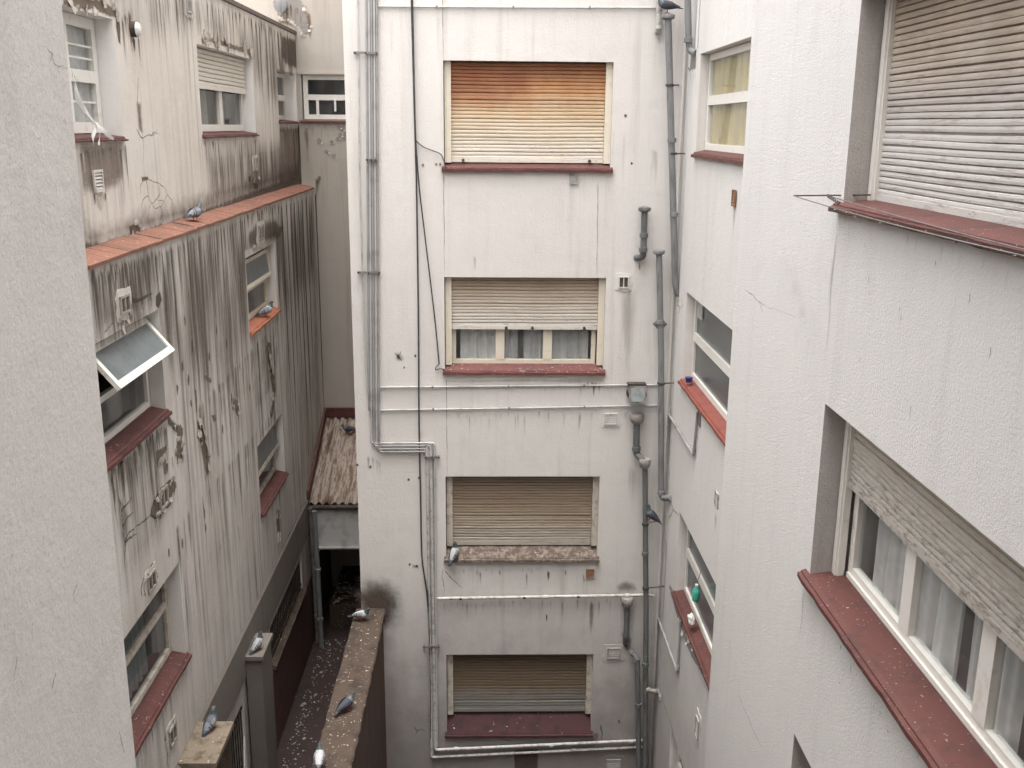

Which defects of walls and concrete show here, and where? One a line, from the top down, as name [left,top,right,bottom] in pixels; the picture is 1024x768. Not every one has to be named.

flaking render [63,0,120,22]
water stain [116,16,139,49]
water stain [232,13,297,89]
water stain [81,145,128,206]
crack [136,97,173,209]
water stain [202,127,307,213]
water stain [92,176,323,406]
peeling [176,362,223,474]
flaking render [151,417,185,519]
water stain [359,588,391,624]